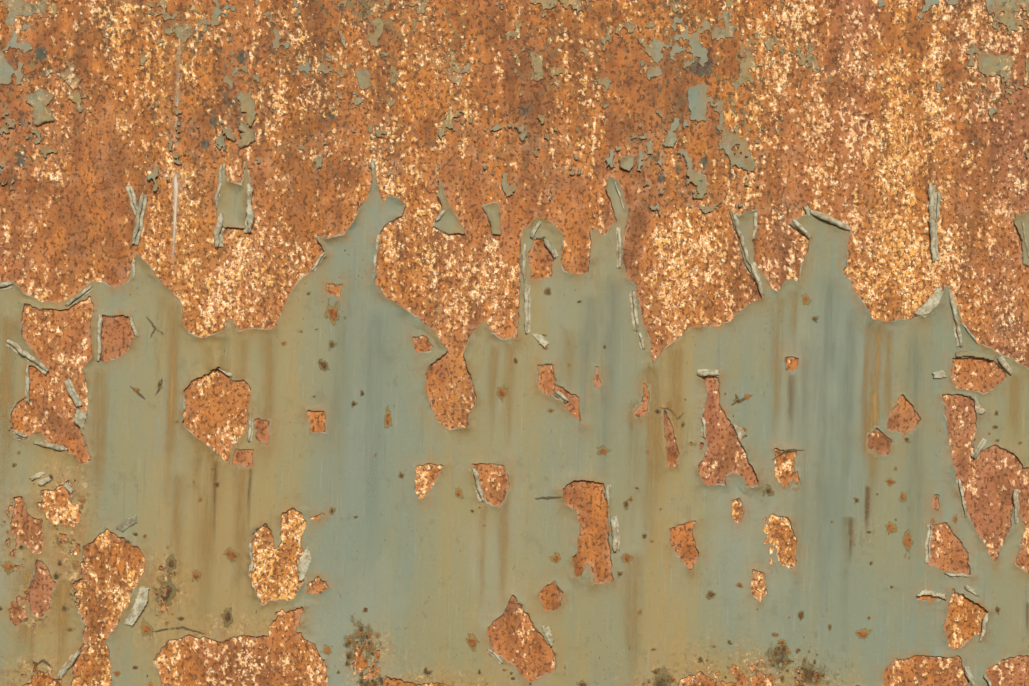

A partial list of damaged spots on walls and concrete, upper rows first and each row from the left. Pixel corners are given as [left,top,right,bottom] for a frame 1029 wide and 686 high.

rust [0,0,1029,433]
peeling [5,296,138,464]
peeling [4,472,168,686]
rust [140,546,184,636]
peeling [182,367,270,467]
rust [222,607,233,628]
peeling [154,508,328,686]
rust [336,607,388,686]
rust [767,632,826,686]
rust [853,466,907,534]
peeling [884,523,1029,686]
peeling [933,349,1029,573]